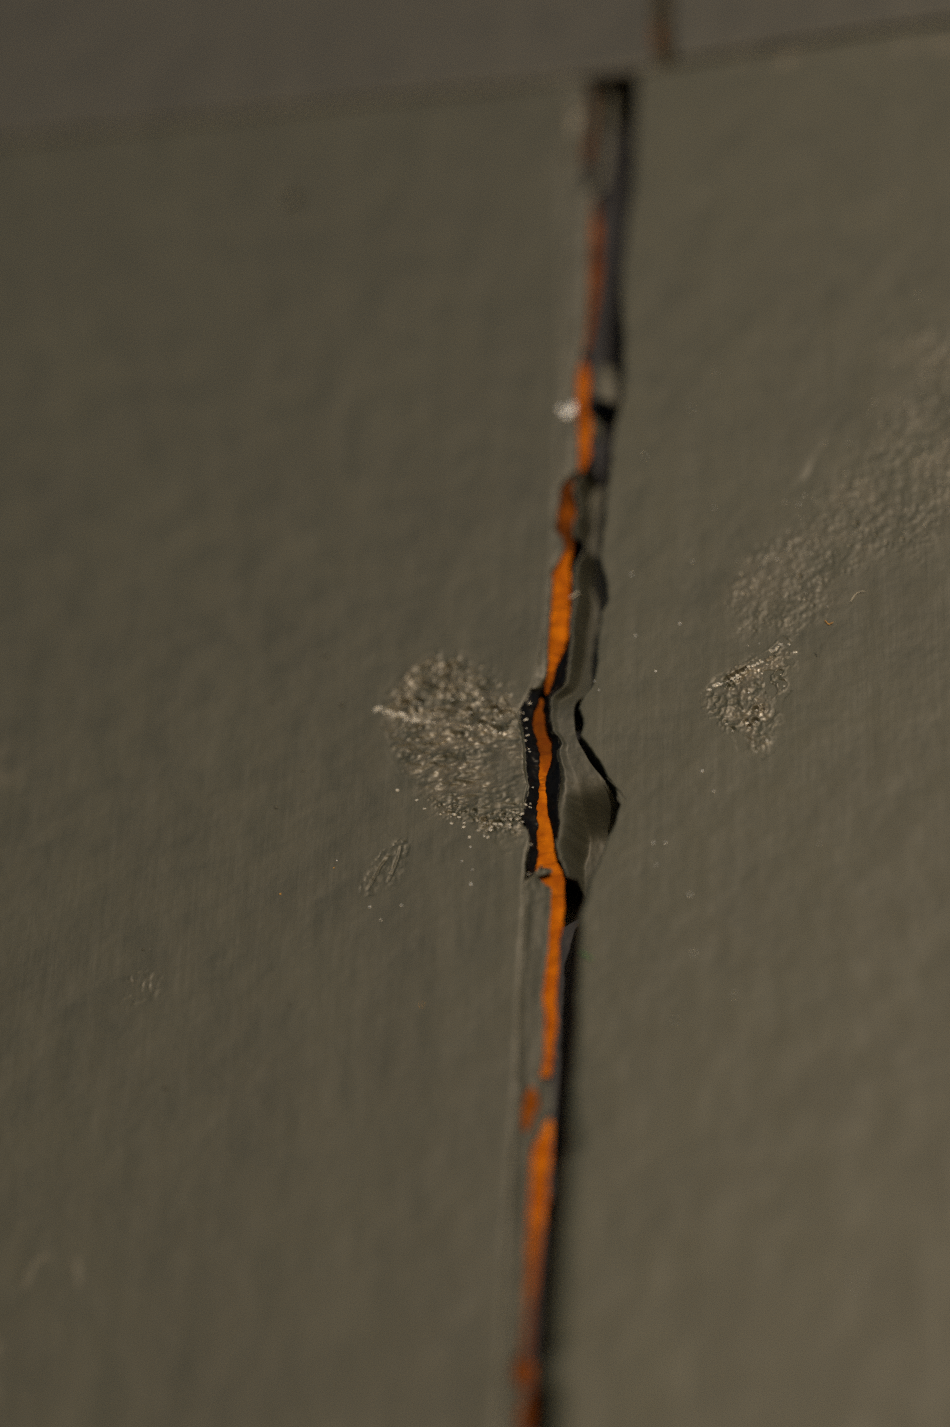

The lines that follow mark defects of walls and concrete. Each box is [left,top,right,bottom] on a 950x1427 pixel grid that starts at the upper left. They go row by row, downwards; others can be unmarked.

spalling [374,644,531,856]
crack [499,81,624,1427]
spalling [699,622,817,762]